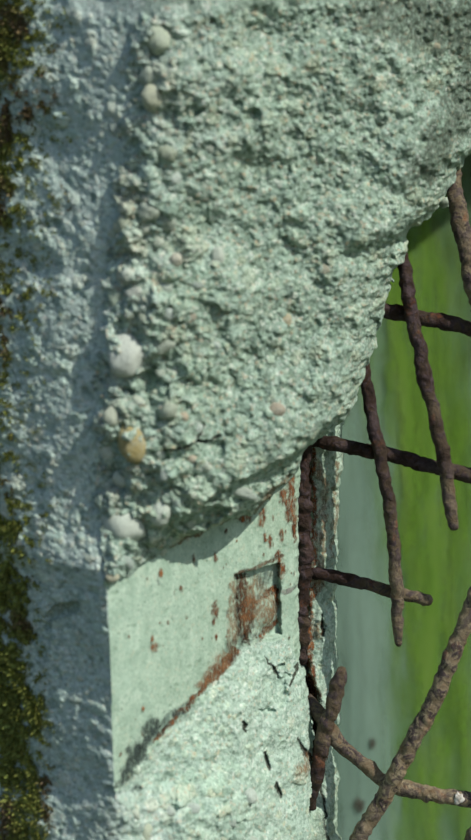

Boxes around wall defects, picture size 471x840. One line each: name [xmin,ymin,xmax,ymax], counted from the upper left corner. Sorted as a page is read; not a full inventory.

spalling [89,0,471,647]
damp [386,267,403,305]
damp [387,319,426,457]
corrosion [309,447,340,569]
damp [337,453,375,579]
damp [395,465,424,590]
corrosion [153,474,297,741]
spalling [115,445,471,840]
corrosion [306,579,325,704]
damp [334,585,395,770]
corrosion [297,717,318,773]
damp [332,748,376,840]